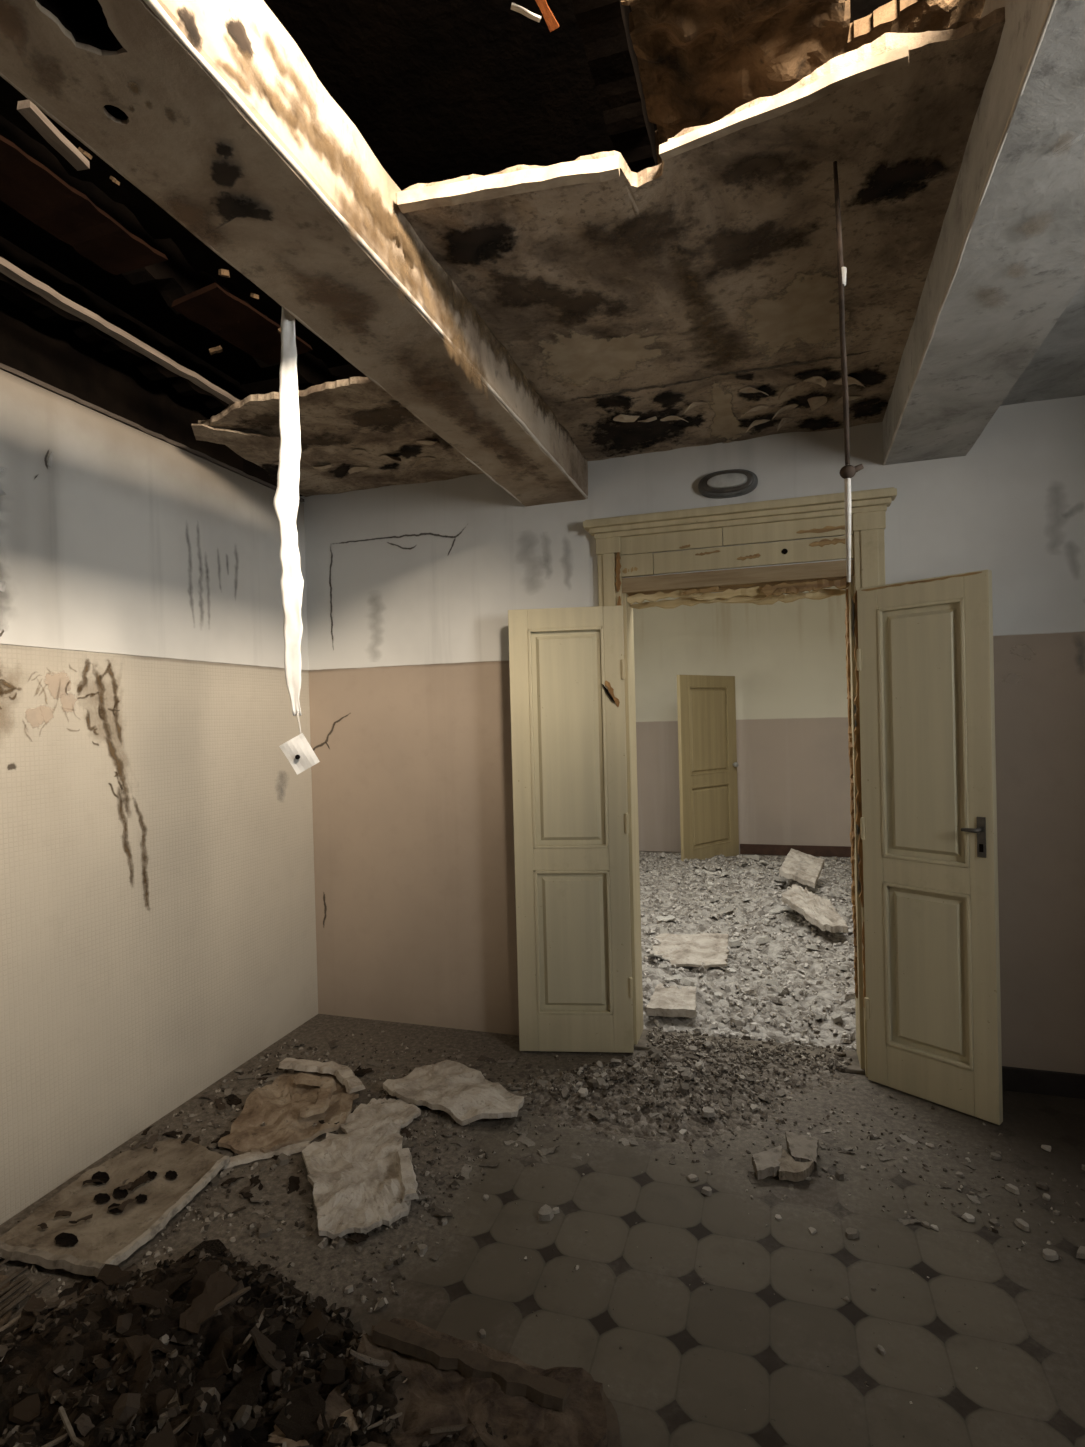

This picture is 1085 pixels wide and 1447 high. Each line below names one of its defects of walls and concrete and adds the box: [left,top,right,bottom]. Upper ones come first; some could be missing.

spalling [37,0,123,51]
spalling [178,6,202,48]
spalling [226,18,255,59]
spalling [104,105,129,120]
water stain [721,152,817,189]
water stain [849,155,947,206]
water stain [211,34,709,458]
water stain [586,211,819,370]
flaking render [738,269,851,360]
flaking render [535,329,664,385]
peeling [736,363,888,434]
crack [329,529,464,641]